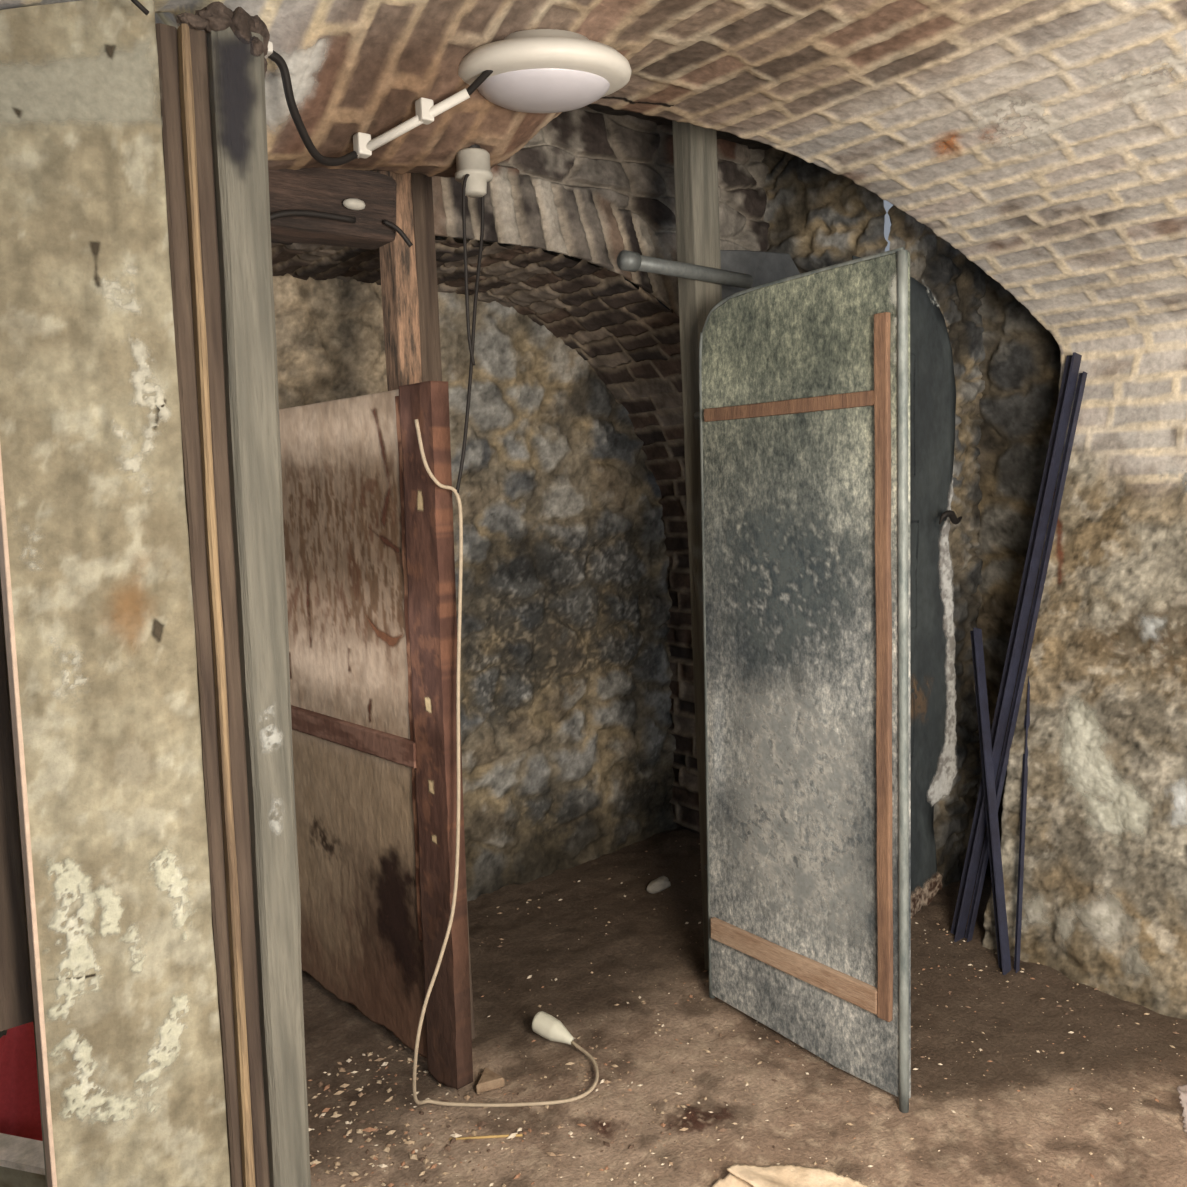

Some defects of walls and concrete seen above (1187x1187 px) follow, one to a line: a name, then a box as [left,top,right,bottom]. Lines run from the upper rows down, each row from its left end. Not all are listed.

water stain [217,39,256,166]
peeling [47,858,145,1020]
peeling [150,850,190,940]
water stain [312,822,336,853]
water stain [371,850,419,990]
peeling [51,995,189,1122]